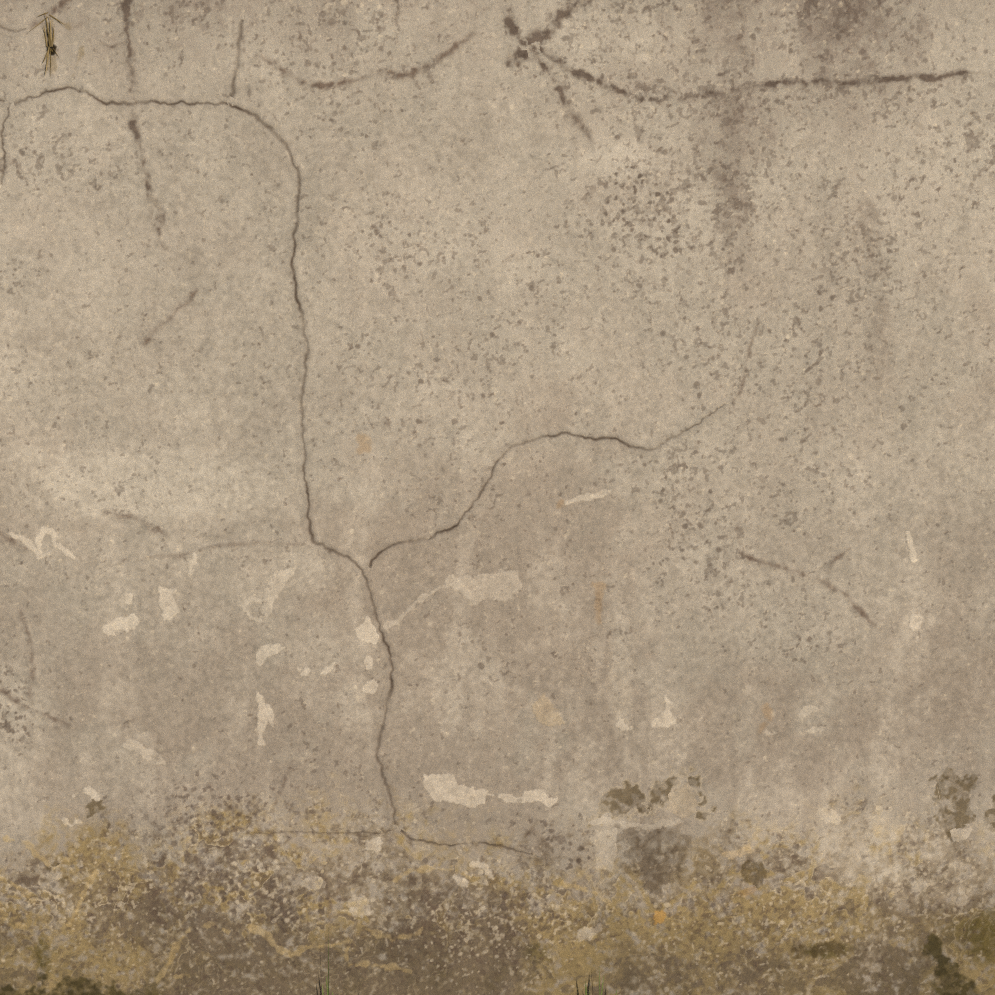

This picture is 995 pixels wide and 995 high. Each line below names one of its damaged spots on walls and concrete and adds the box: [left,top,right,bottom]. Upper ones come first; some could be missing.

crack [499,0,986,148]
crack [0,0,785,944]
peeling [7,525,76,561]
peeling [101,592,140,636]
peeling [353,566,524,694]
peeling [255,691,275,747]
spalling [421,765,717,897]
leakage [809,812,984,913]
spalling [926,767,995,848]
leakage [0,920,231,995]
leakage [247,923,413,974]
leakage [862,944,882,973]